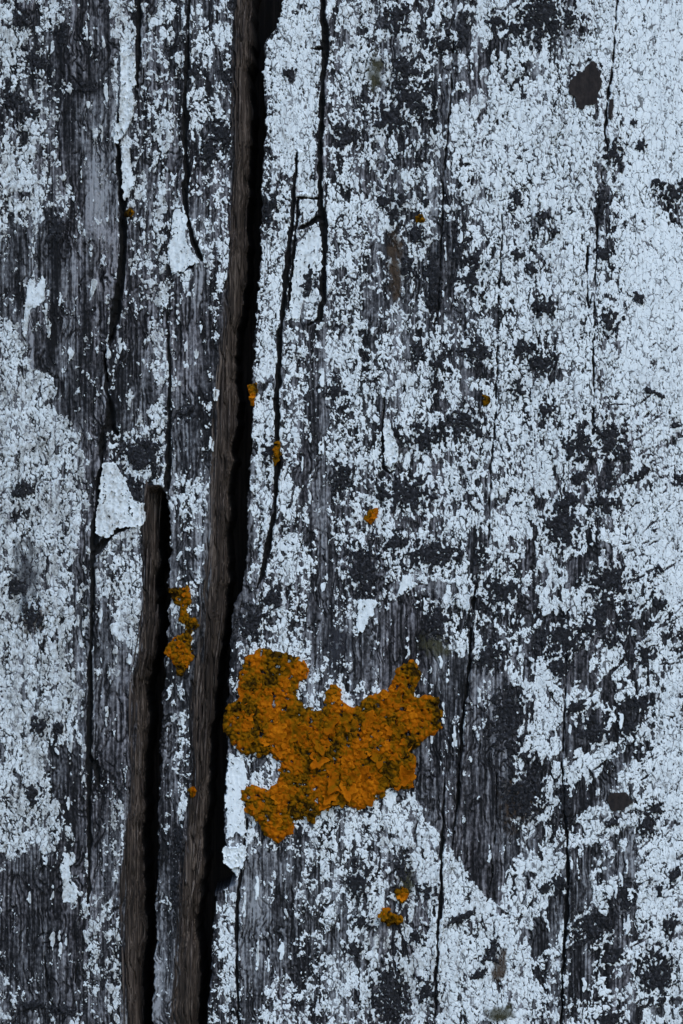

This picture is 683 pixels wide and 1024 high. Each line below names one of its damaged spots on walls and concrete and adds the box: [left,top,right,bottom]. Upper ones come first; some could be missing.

spalling [568,61,614,120]
peeling [5,0,154,538]
peeling [167,205,220,477]
crack [85,0,329,1024]
peeling [289,227,323,320]
peeling [292,333,337,663]
peeling [383,418,398,467]
peeling [0,593,137,1009]
peeling [222,753,305,1024]
peeling [349,574,518,906]
crack [434,588,476,1018]
peeling [560,705,652,814]